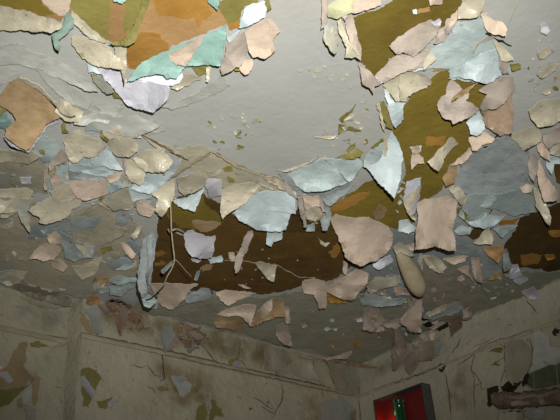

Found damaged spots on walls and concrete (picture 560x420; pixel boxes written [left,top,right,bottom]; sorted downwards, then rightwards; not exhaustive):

peeling [0,0,280,113]
peeling [321,0,560,226]
peeling [0,42,560,375]
peeling [0,341,48,407]
peeling [80,367,115,409]
crack [452,330,528,408]
spalling [487,330,560,407]